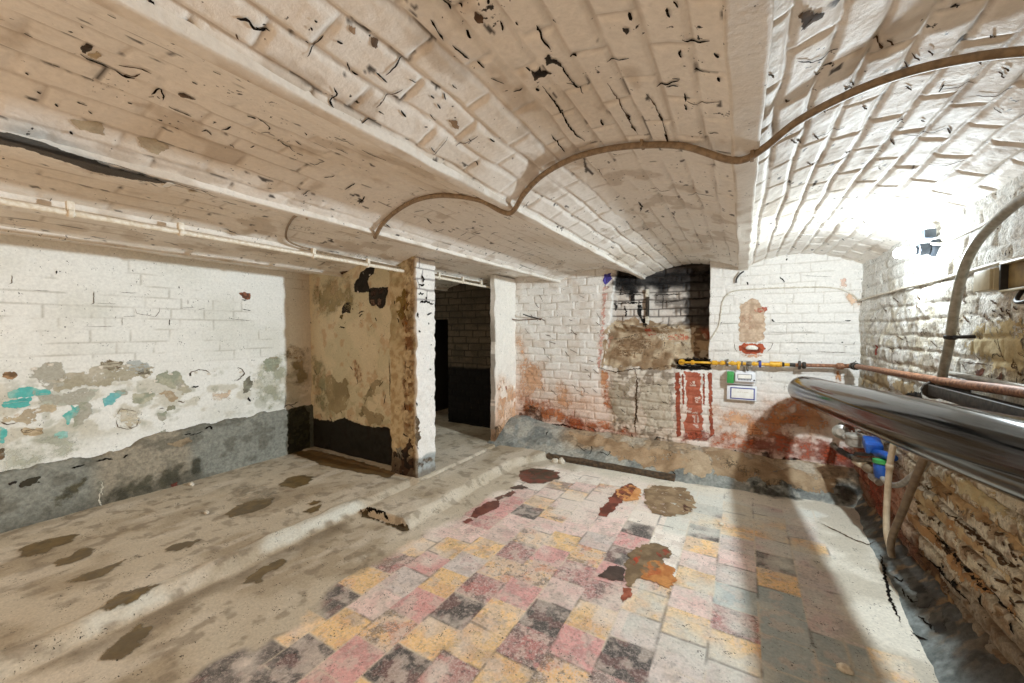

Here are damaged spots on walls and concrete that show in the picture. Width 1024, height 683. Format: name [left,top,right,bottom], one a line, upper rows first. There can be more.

spalling [339,274,388,328]
peeling [738,298,774,358]
peeling [0,359,213,447]
damp [116,409,140,429]
peeling [215,367,253,401]
peeling [321,363,386,425]
spalling [393,403,421,476]
spalling [569,294,715,473]
spalling [8,476,41,488]
damp [57,458,200,506]
damp [225,475,313,518]
crack [823,524,932,640]